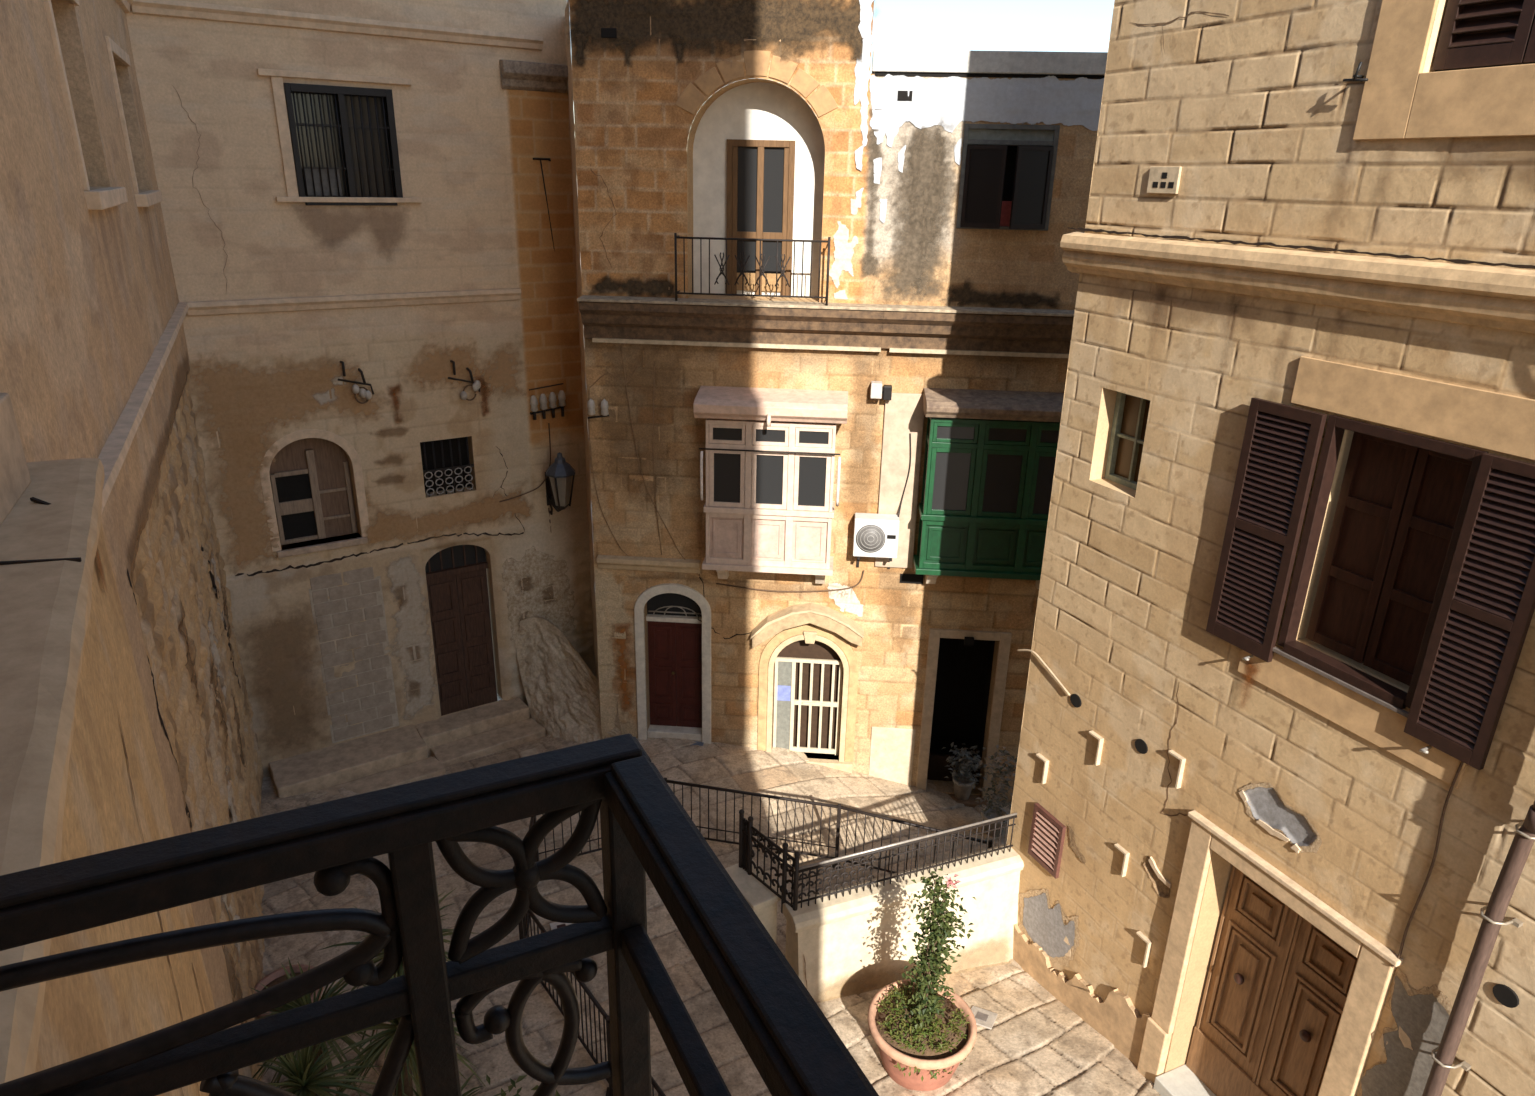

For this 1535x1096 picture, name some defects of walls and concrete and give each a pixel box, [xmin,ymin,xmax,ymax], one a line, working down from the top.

water stain [570,0,863,66]
peeling [850,0,1104,223]
crack [172,85,228,290]
water stain [862,109,1058,308]
crack [1161,685,1188,816]
peeling [1019,888,1081,967]
flaking render [1143,856,1171,898]
flaking render [1238,783,1322,853]
peeling [1358,969,1452,1096]